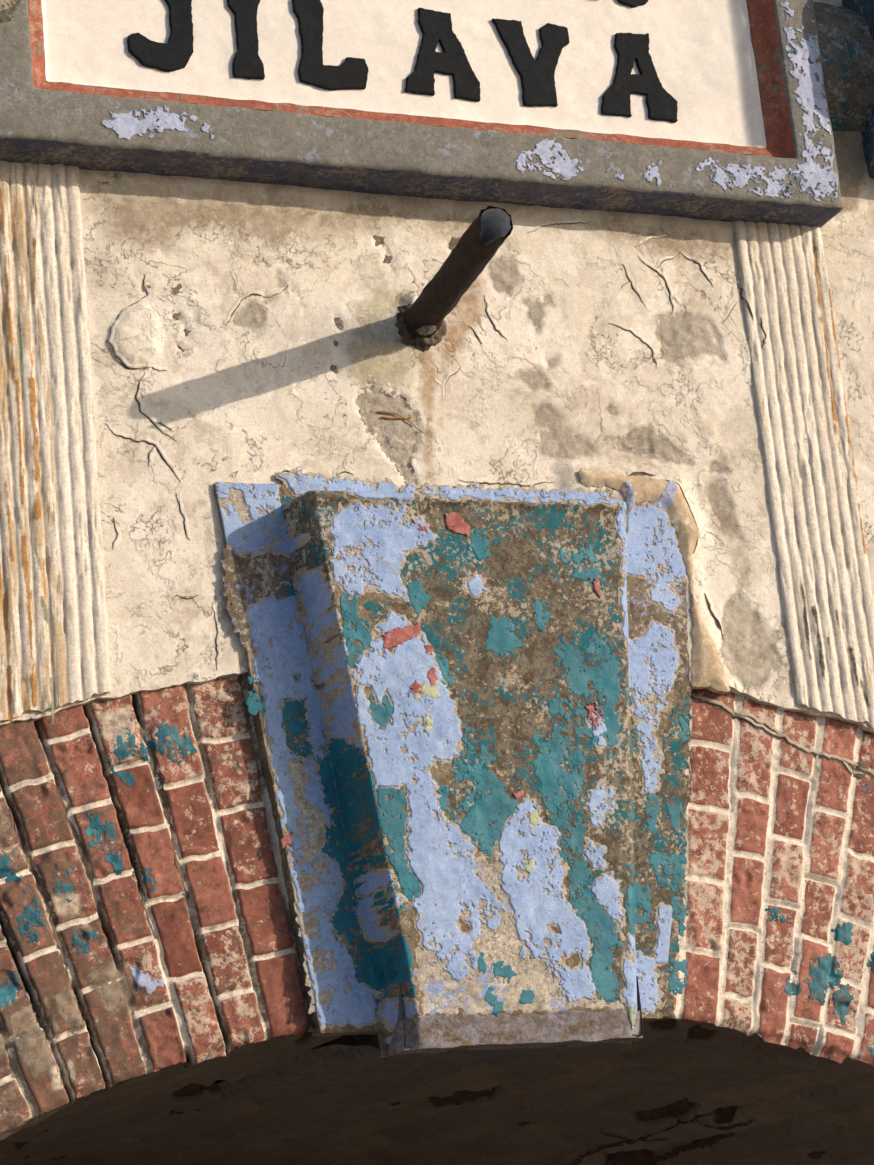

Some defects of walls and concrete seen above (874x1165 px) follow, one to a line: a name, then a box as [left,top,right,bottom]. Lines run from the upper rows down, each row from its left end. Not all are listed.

crack [526,219,592,233]
crack [223,273,289,325]
crack [608,231,769,369]
rust [813,247,857,486]
rust [5,274,41,707]
crack [105,372,193,540]
peeling [100,707,197,787]
peeling [221,380,692,1043]
crack [690,692,874,779]
peeling [0,855,82,945]
peeling [85,811,158,892]
peeling [784,922,854,1029]